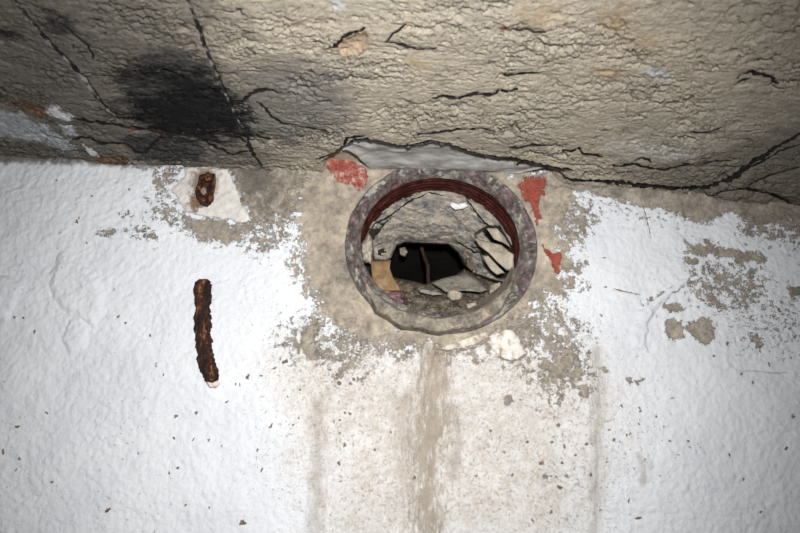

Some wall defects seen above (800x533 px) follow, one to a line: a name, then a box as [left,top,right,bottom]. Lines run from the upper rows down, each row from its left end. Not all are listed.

crack [59,22,94,59]
crack [326,27,366,49]
crack [385,24,437,50]
water stain [0,0,352,202]
crack [432,72,535,100]
crack [70,88,800,204]
corrosion [187,169,214,213]
peeling [96,158,800,428]
water stain [255,330,655,533]